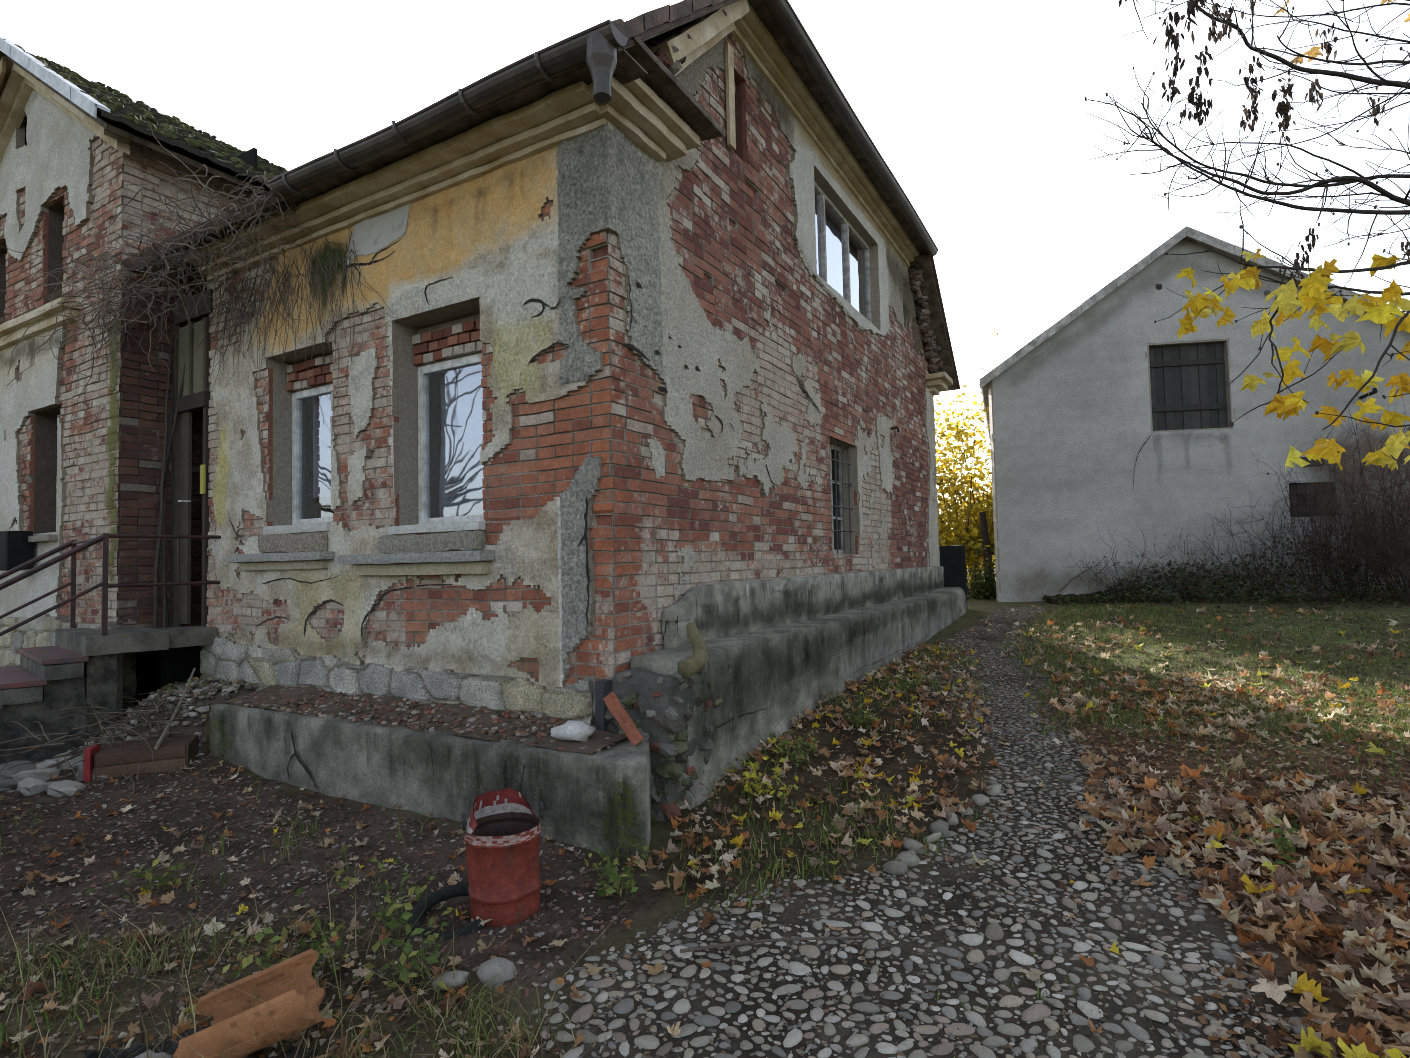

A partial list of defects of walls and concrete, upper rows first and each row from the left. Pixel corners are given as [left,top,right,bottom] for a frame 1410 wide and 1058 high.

peeling [345,204,410,265]
flaking render [0,125,291,645]
flaking render [316,303,399,531]
flaking render [481,33,936,716]
flaking render [309,601,344,642]
flaking render [357,574,551,661]
damp [697,571,950,739]
crack [287,729,317,789]